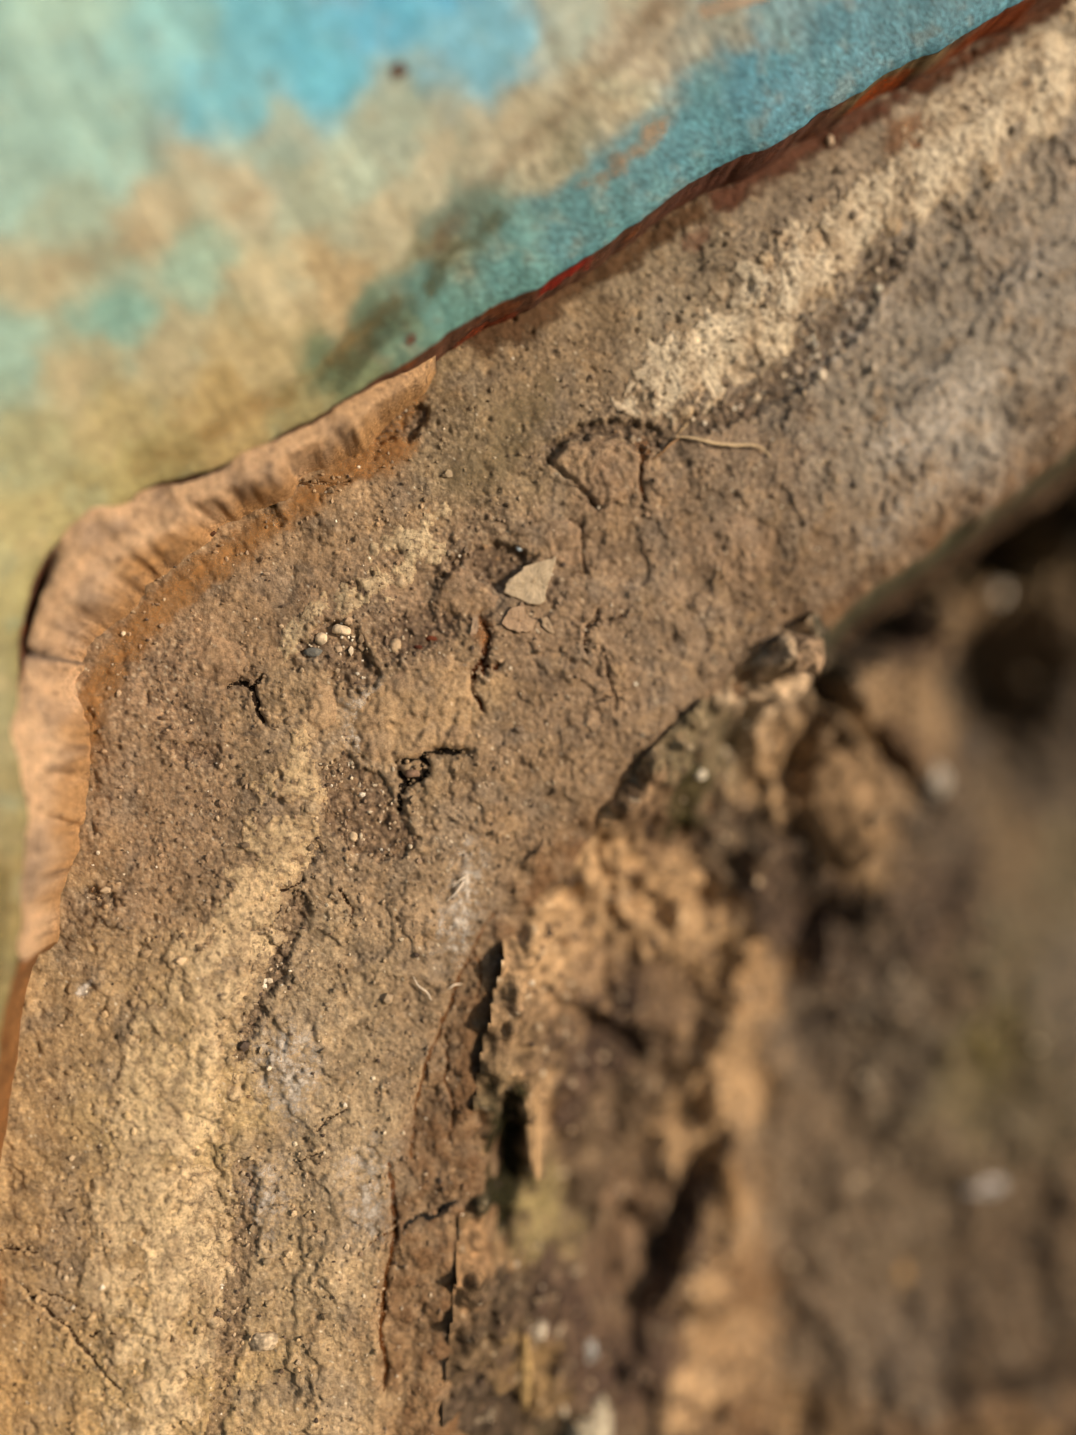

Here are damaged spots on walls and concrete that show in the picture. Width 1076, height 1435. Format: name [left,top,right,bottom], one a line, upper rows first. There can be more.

corrosion [458,0,1069,354]
crack [639,443,659,502]
crack [549,463,629,712]
crack [227,673,265,724]
crack [471,616,501,712]
crack [395,747,464,811]
crack [369,912,496,1392]